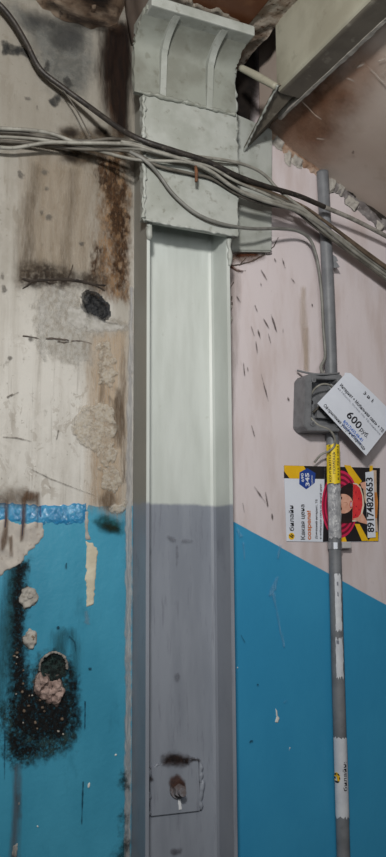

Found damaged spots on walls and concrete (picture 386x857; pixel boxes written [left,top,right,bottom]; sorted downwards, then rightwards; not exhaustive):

flaking render [272,131,319,176]
corrosion [62,129,131,301]
flaking render [329,178,386,231]
peeling [73,403,122,493]
peeling [0,519,44,576]
peeling [85,511,98,607]
peeling [18,586,39,610]
peeling [12,628,37,671]
flaking render [15,672,66,729]
corrosion [163,754,199,788]